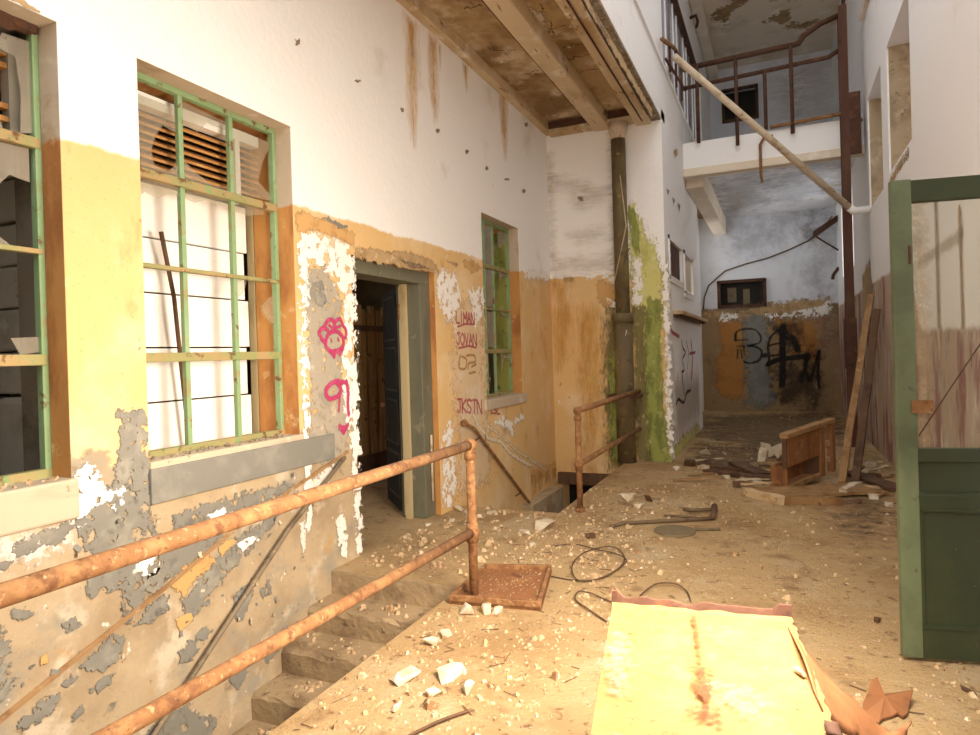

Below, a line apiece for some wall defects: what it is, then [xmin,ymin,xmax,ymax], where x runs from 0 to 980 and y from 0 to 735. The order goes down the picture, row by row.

peeling [710,0,748,26]
peeling [762,0,819,30]
water stain [627,203,846,469]
peeling [0,210,485,571]
flaking render [494,414,524,437]
water stain [602,301,624,472]
water stain [834,495,897,535]
peeling [0,624,24,702]
peeling [9,606,34,621]
peeling [17,515,282,735]